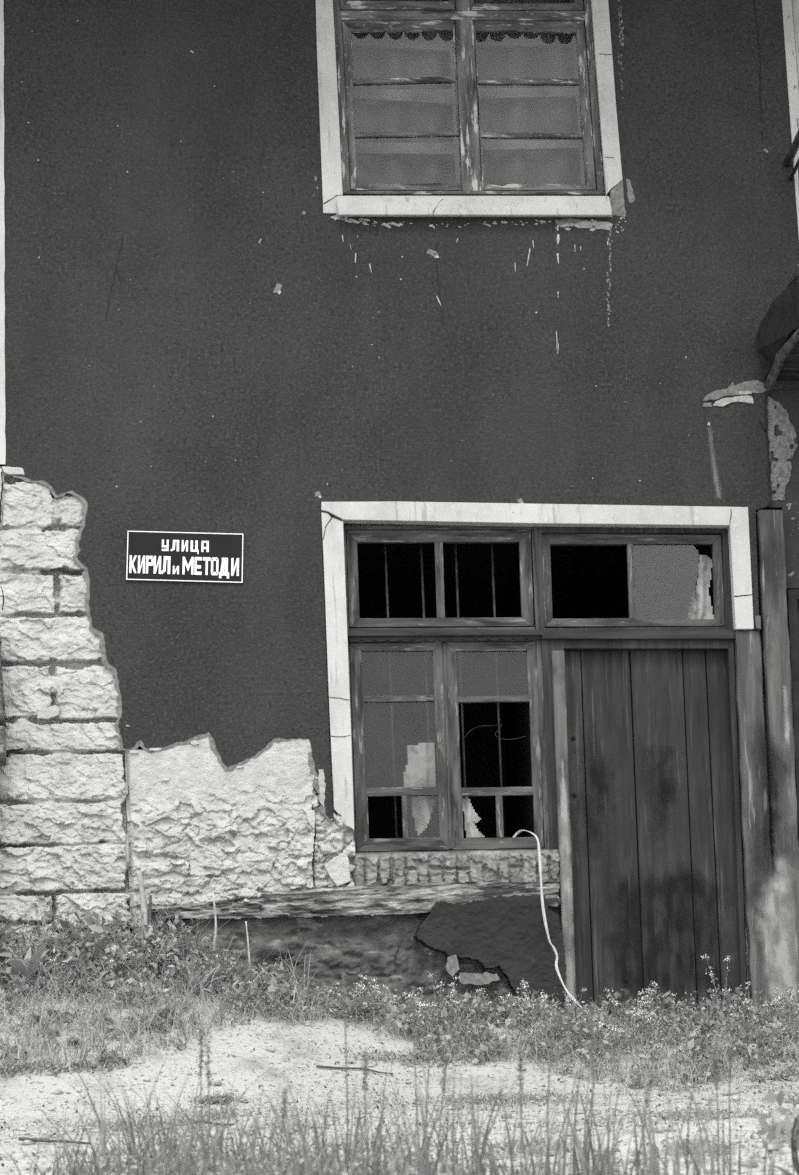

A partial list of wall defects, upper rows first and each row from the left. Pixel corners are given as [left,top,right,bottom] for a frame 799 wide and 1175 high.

flaking render [703,380,799,535]
flaking render [0,466,355,948]